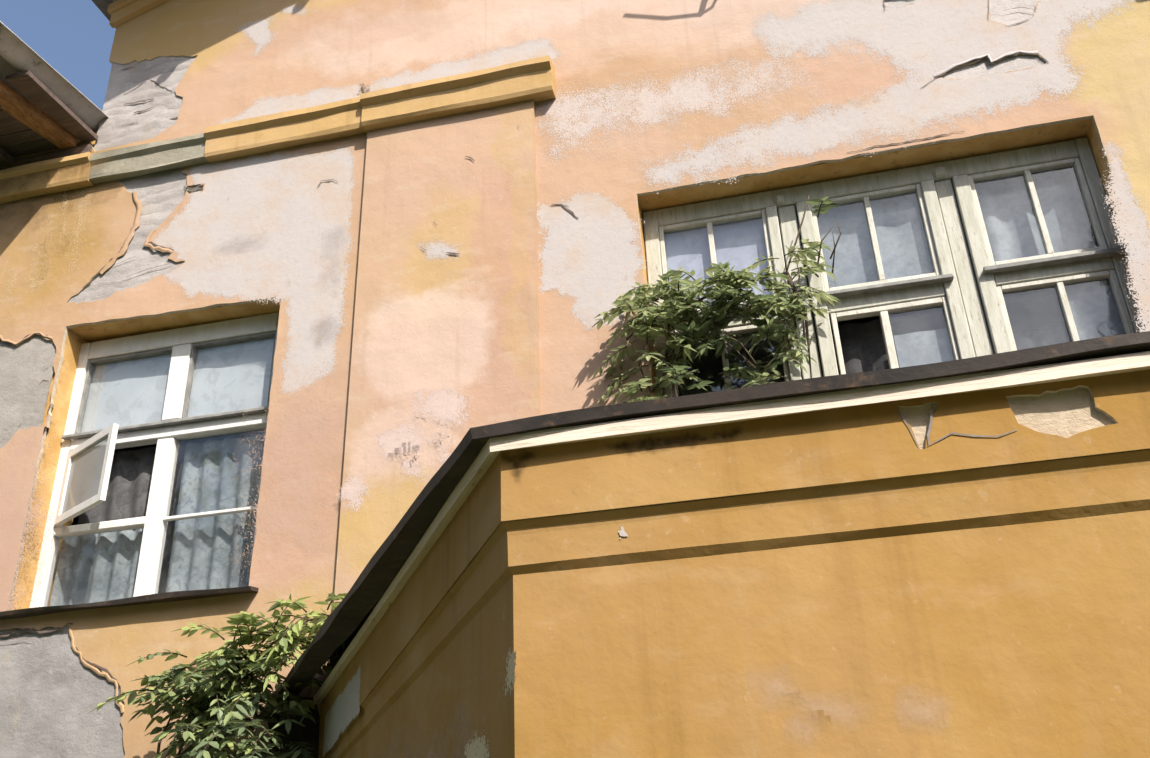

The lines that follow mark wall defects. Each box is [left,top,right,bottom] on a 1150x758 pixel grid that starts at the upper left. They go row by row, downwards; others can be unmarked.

flaking render [94,56,196,151]
peeling [535,0,1150,194]
peeling [537,188,647,331]
peeling [1100,141,1150,332]
peeling [68,143,373,586]
flaking render [899,404,938,449]
flaking render [1007,387,1115,438]
flaking render [0,332,125,758]
peeling [323,665,361,757]